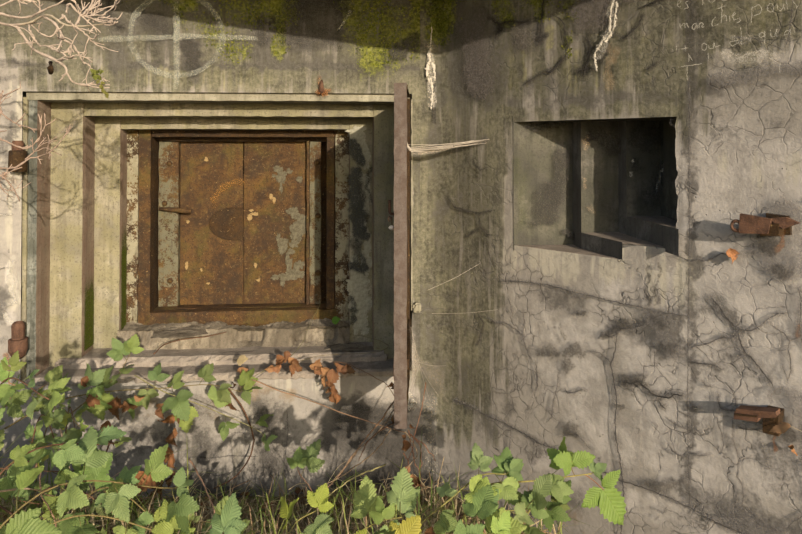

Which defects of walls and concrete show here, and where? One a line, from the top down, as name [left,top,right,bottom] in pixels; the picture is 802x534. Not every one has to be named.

leakage [180,39,200,75]
leakage [390,26,436,124]
leakage [569,0,634,71]
spalling [117,126,374,351]
crack [447,78,802,534]
leakage [330,392,436,490]